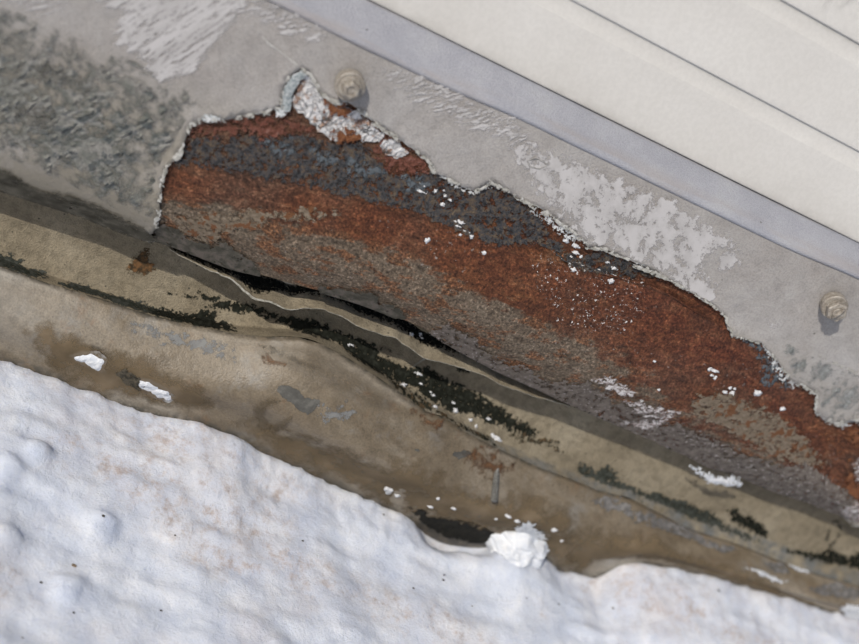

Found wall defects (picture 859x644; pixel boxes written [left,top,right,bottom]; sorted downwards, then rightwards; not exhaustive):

peeling [281,70,409,159]
water stain [0,169,159,246]
corrosion [127,68,859,527]
water stain [0,248,564,453]
peeling [277,385,356,424]
water stain [254,400,815,605]
water stain [786,548,859,569]